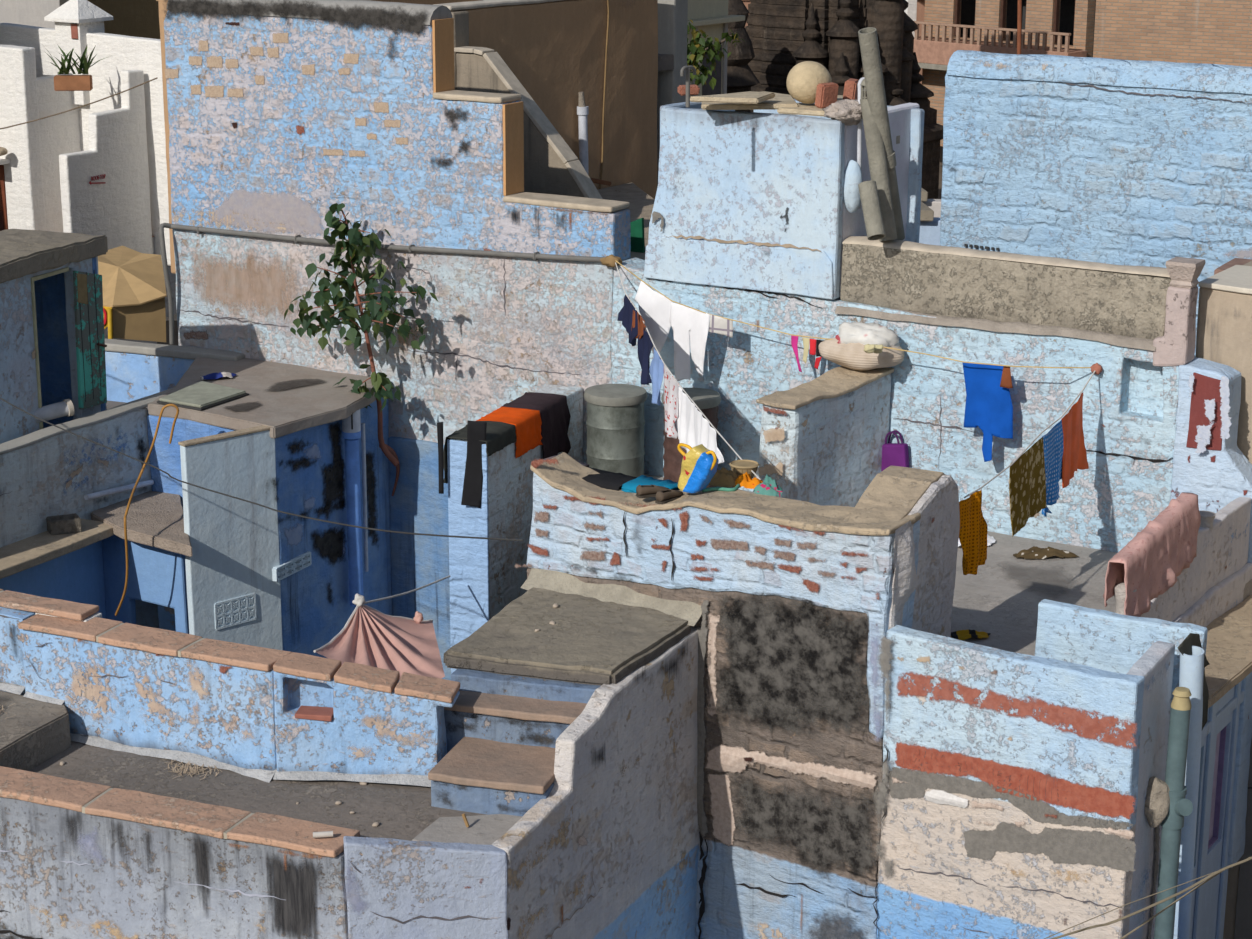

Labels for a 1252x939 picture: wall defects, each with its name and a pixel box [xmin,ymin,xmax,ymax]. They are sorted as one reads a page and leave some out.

damp [164,0,426,58]
peeling [1187,374,1231,463]
damp [279,423,346,564]
flaking render [515,495,620,568]
flaking render [658,508,867,593]
damp [716,595,869,734]
crack [881,745,889,826]
flaking render [888,767,1136,872]
crack [0,910,42,939]
damp [267,856,317,939]
crack [697,832,708,939]
crack [737,868,1122,936]